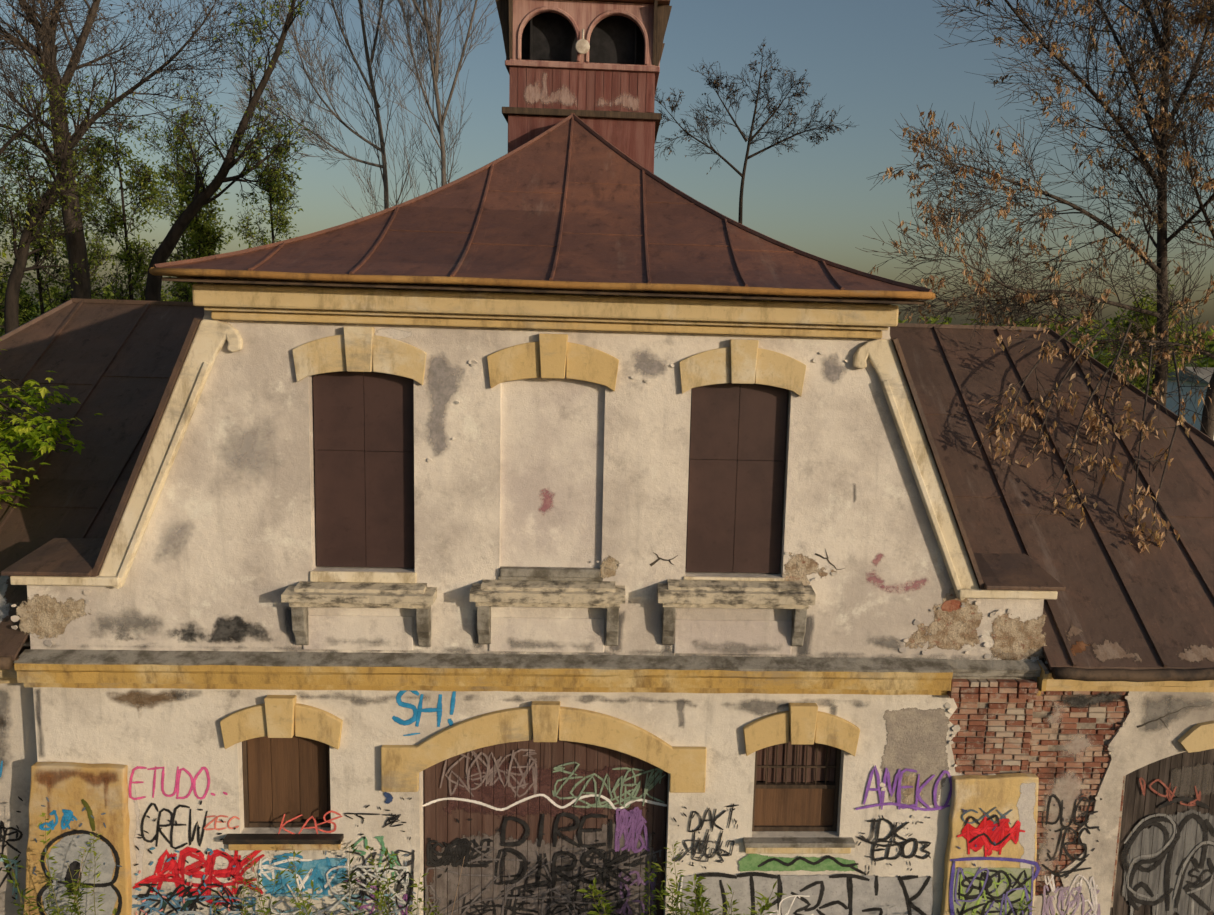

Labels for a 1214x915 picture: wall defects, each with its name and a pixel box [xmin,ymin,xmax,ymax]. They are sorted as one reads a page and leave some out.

peeling [524,73,577,106]
crack [650,552,678,566]
flaking render [783,552,838,608]
crack [815,549,844,570]
flaking render [11,590,91,647]
water stain [99,615,161,636]
water stain [173,617,268,642]
water stain [284,608,303,652]
flaking render [899,588,1048,664]
flaking render [879,679,1131,907]